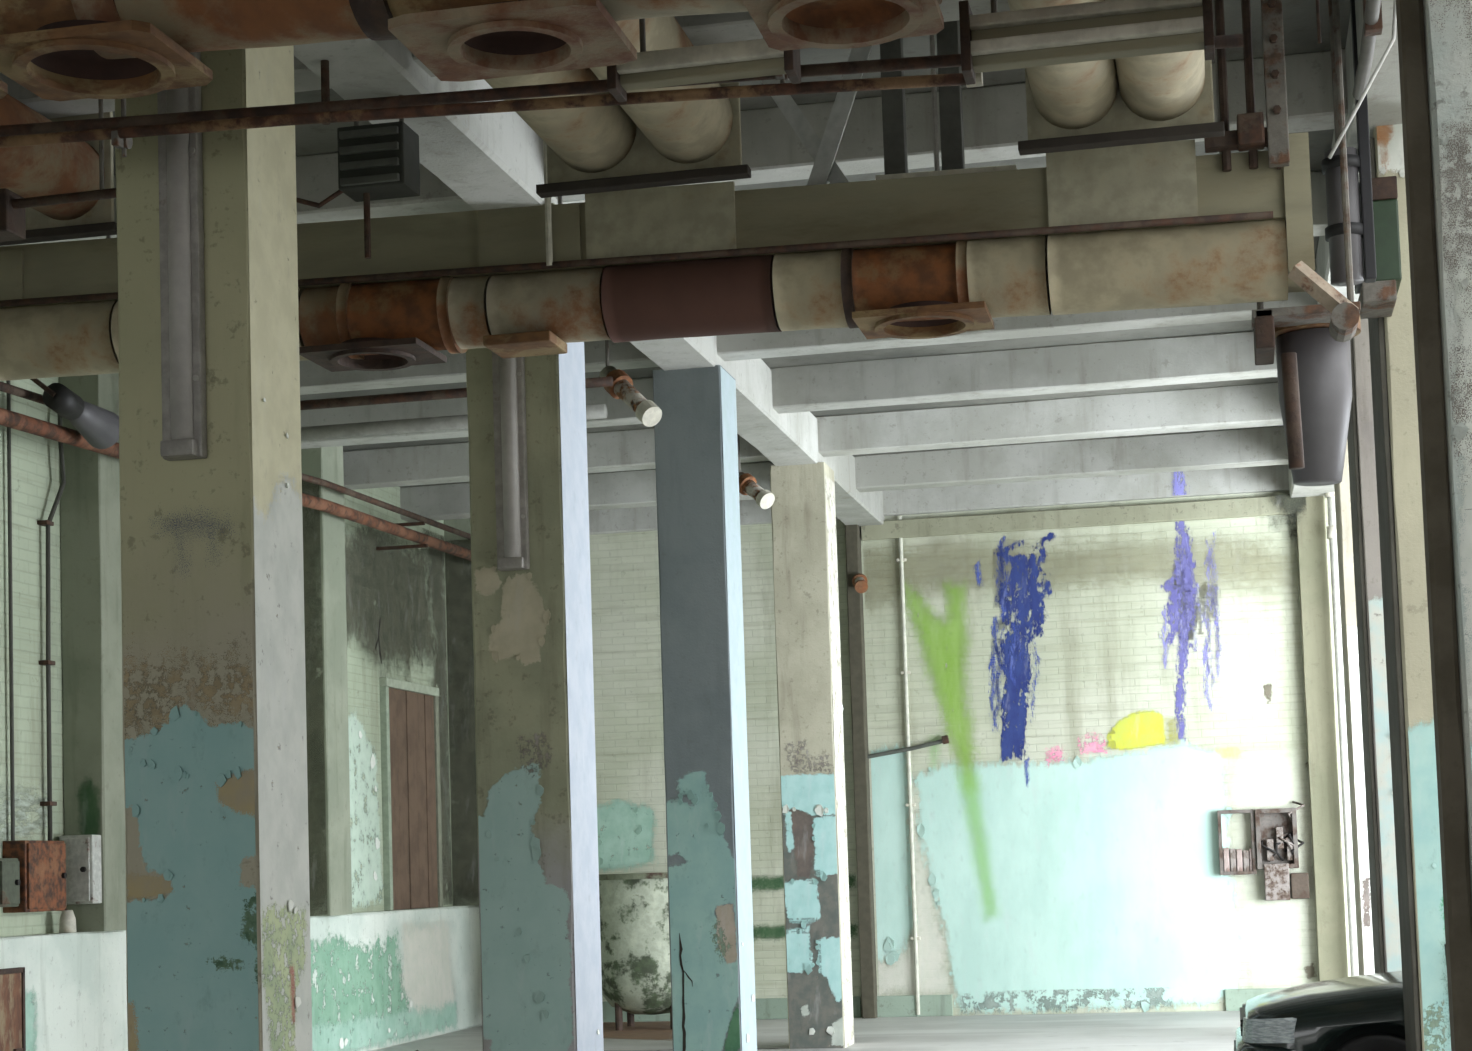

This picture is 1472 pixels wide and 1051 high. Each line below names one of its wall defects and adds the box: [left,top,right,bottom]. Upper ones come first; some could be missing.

peeling [25,987,42,1051]
peeling [245,45,295,108]
peeling [124,125,458,1051]
peeling [474,342,757,1051]
spalling [781,475,854,1049]
peeling [1430,0,1472,770]